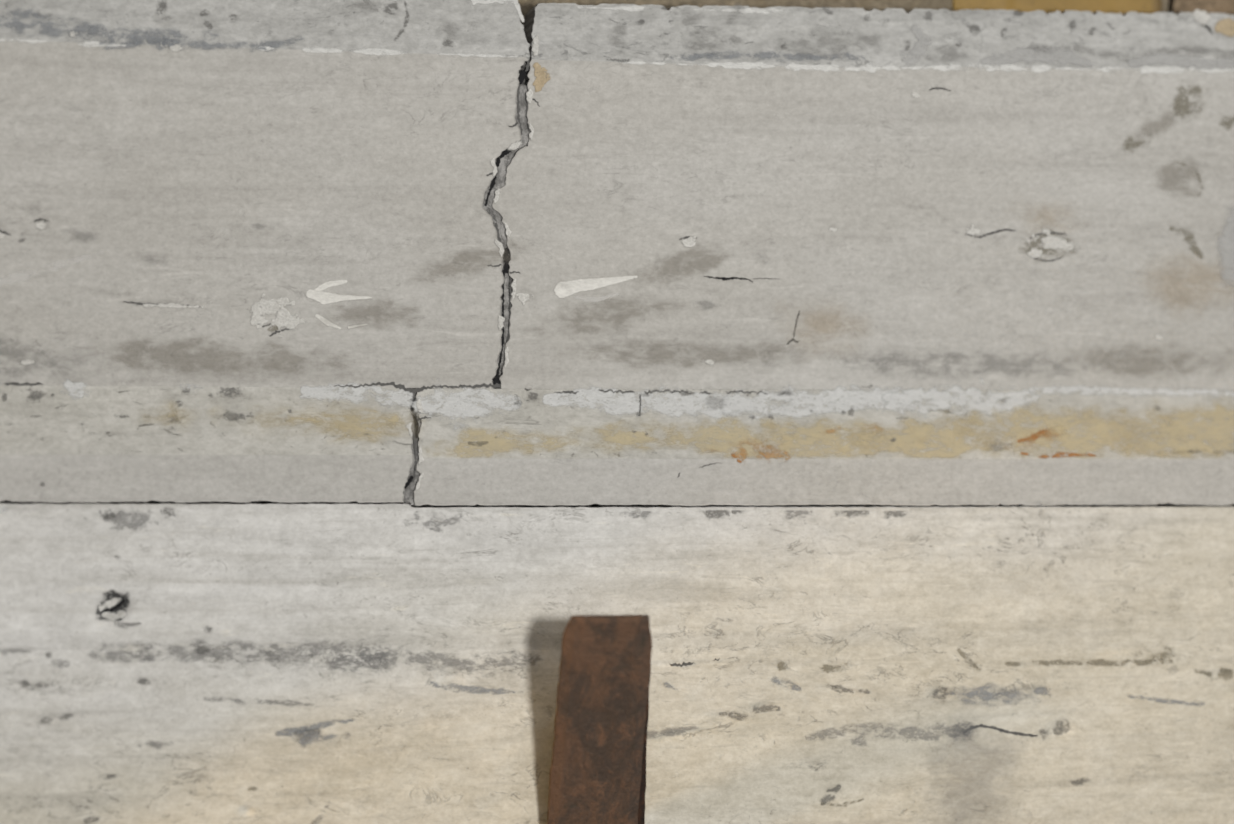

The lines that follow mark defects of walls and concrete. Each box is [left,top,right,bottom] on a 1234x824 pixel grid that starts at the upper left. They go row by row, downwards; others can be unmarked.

spalling [965,224,1080,262]
crack [335,35,791,505]
spalling [250,293,306,337]
peeling [98,597,127,621]